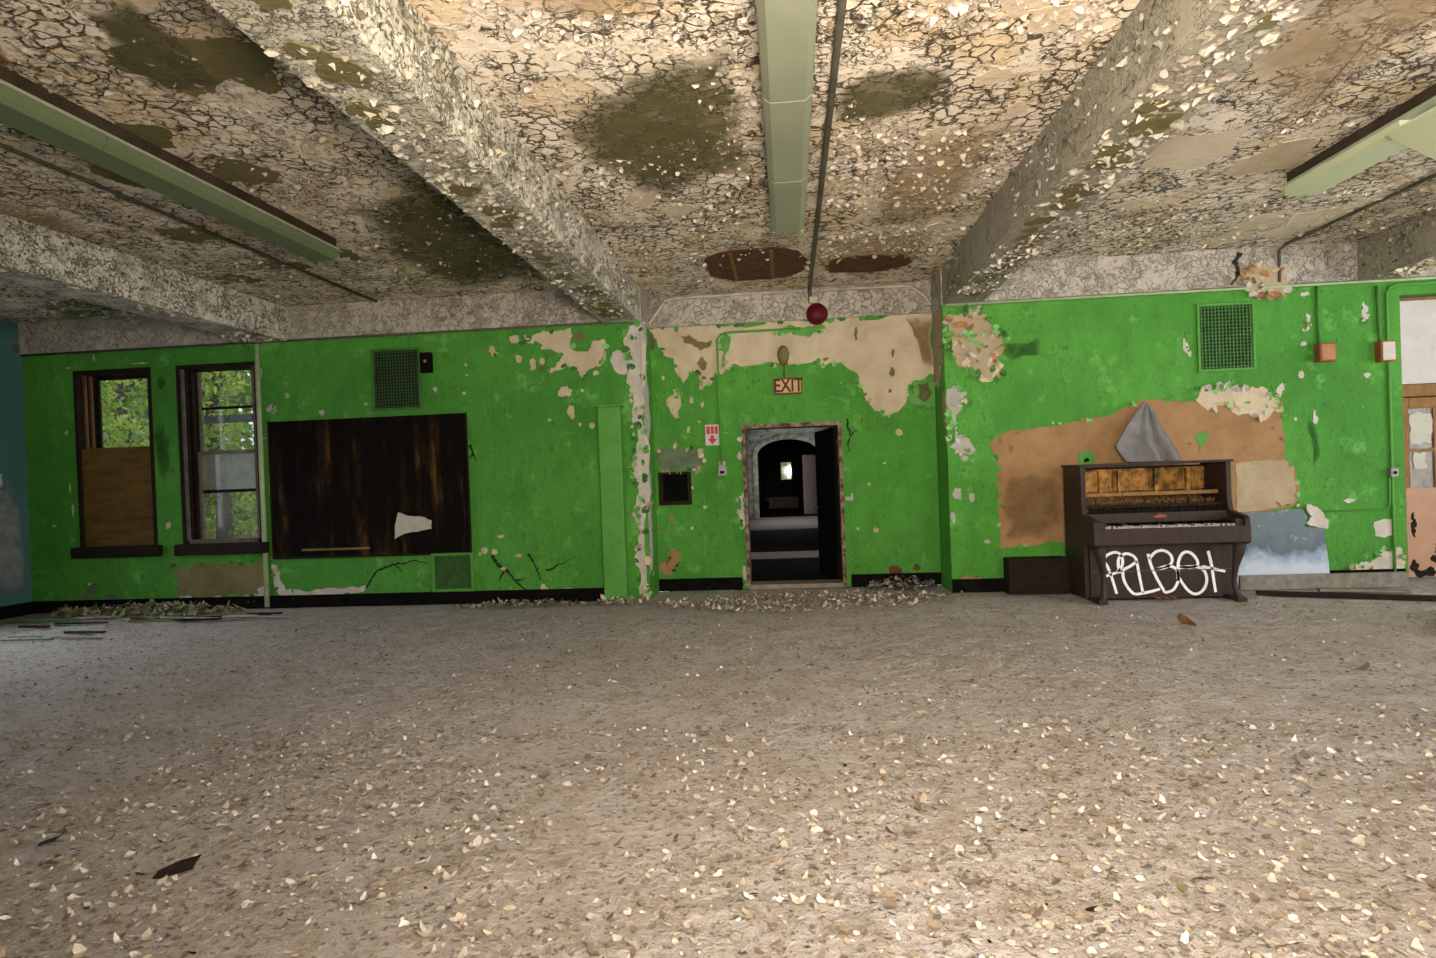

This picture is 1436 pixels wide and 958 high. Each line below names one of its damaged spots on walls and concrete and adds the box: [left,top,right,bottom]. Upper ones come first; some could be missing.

damp [91,6,211,89]
damp [575,63,751,190]
damp [839,70,944,120]
damp [366,185,539,286]
peeling [0,0,1436,598]
peeling [171,560,366,606]